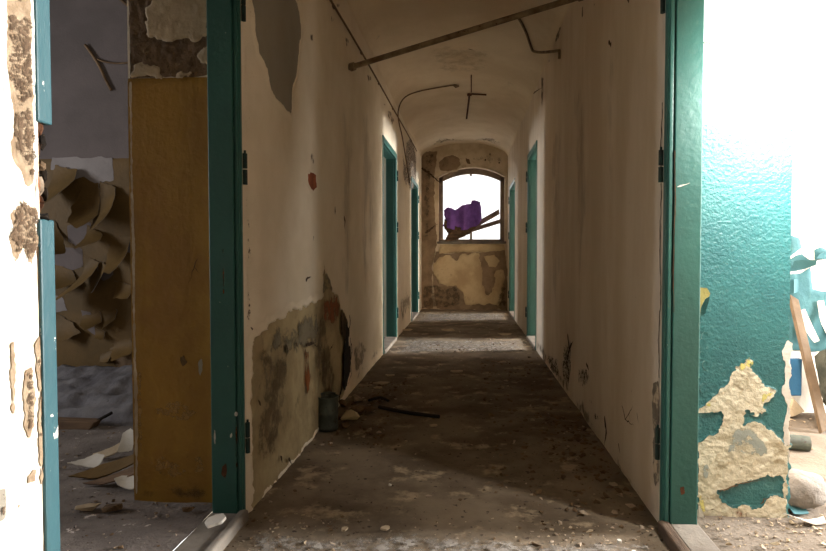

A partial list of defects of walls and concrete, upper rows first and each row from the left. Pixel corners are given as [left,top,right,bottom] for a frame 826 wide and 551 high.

peeling [249,0,303,124]
peeling [0,0,207,494]
spalling [306,169,318,195]
spalling [421,151,508,310]
spalling [697,235,826,518]